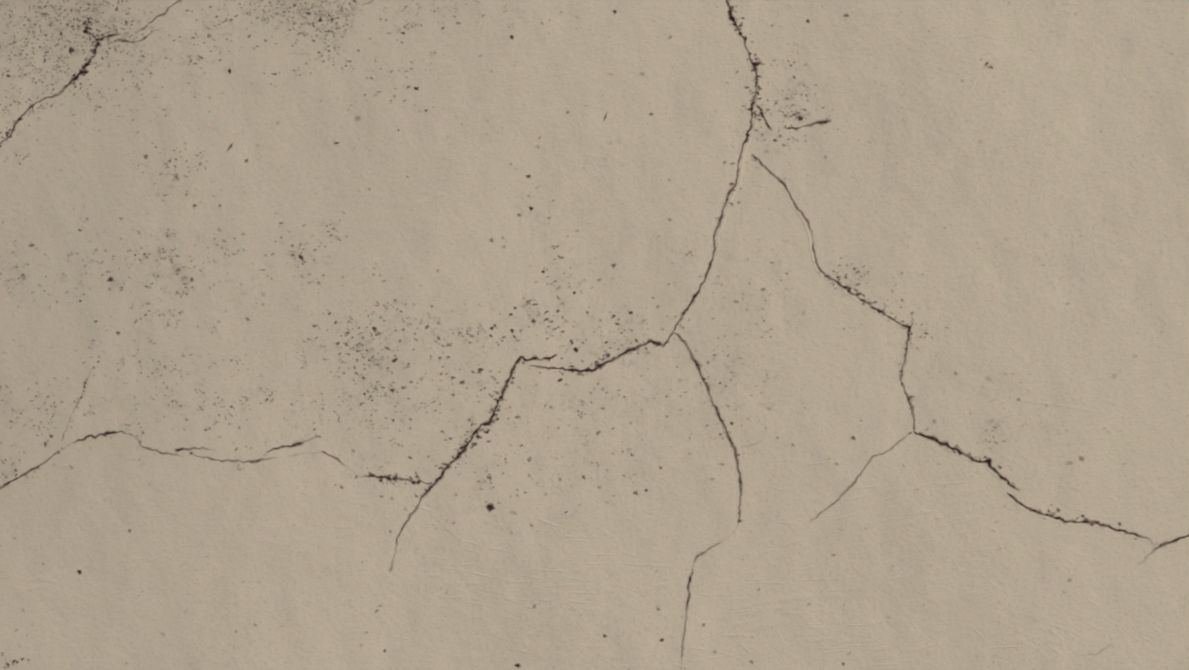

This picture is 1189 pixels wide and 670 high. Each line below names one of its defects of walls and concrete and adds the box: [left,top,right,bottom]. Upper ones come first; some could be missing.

crack [0,27,127,149]
crack [367,0,1189,568]
crack [78,431,122,441]
crack [251,436,337,463]